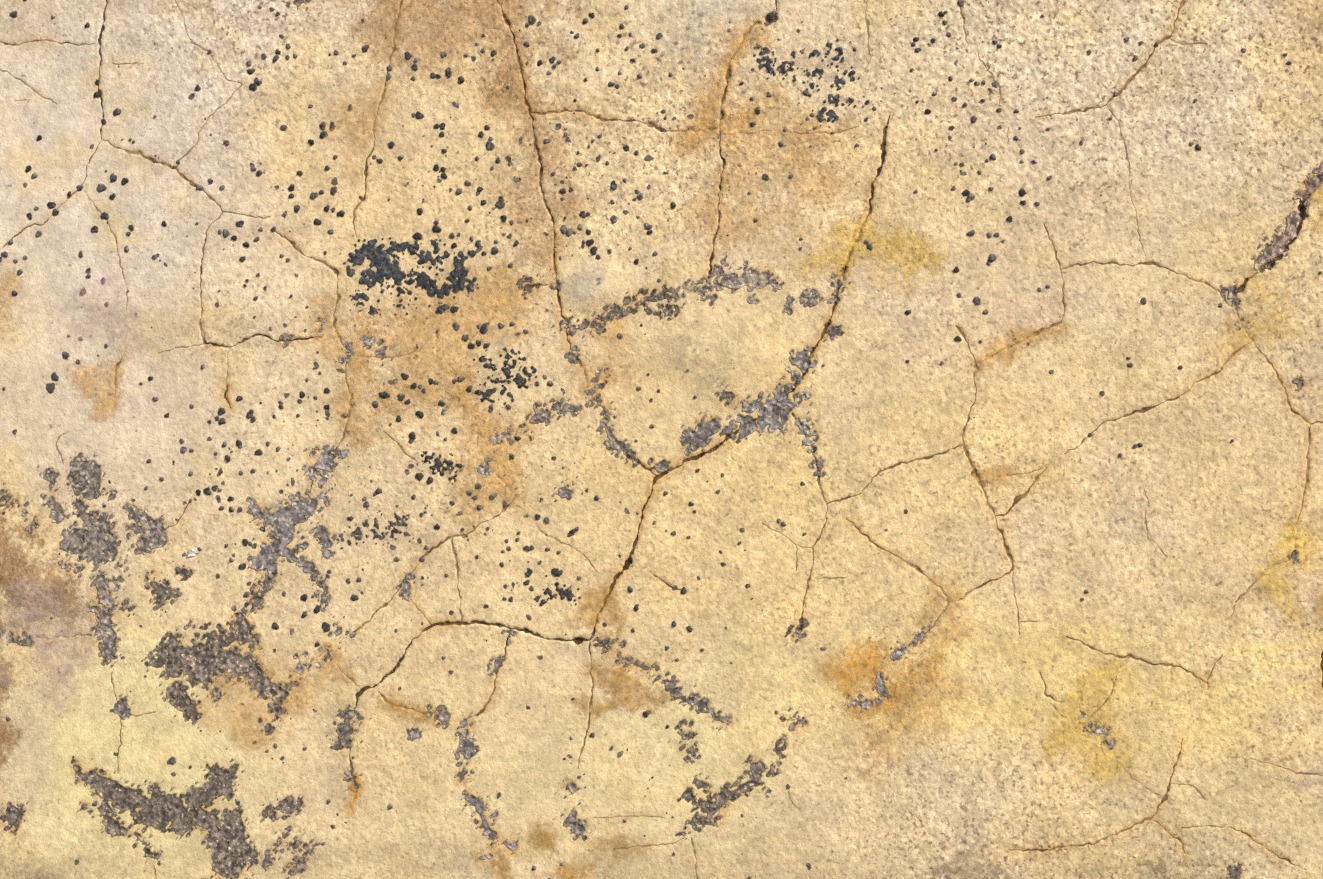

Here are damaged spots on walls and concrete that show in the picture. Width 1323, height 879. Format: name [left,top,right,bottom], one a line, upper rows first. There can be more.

crack [0,0,424,497]
crack [335,0,1323,768]
crack [31,632,92,640]
crack [111,672,156,774]
crack [348,748,356,803]
crack [593,815,698,879]
crack [1008,738,1307,870]
crack [1243,757,1323,776]